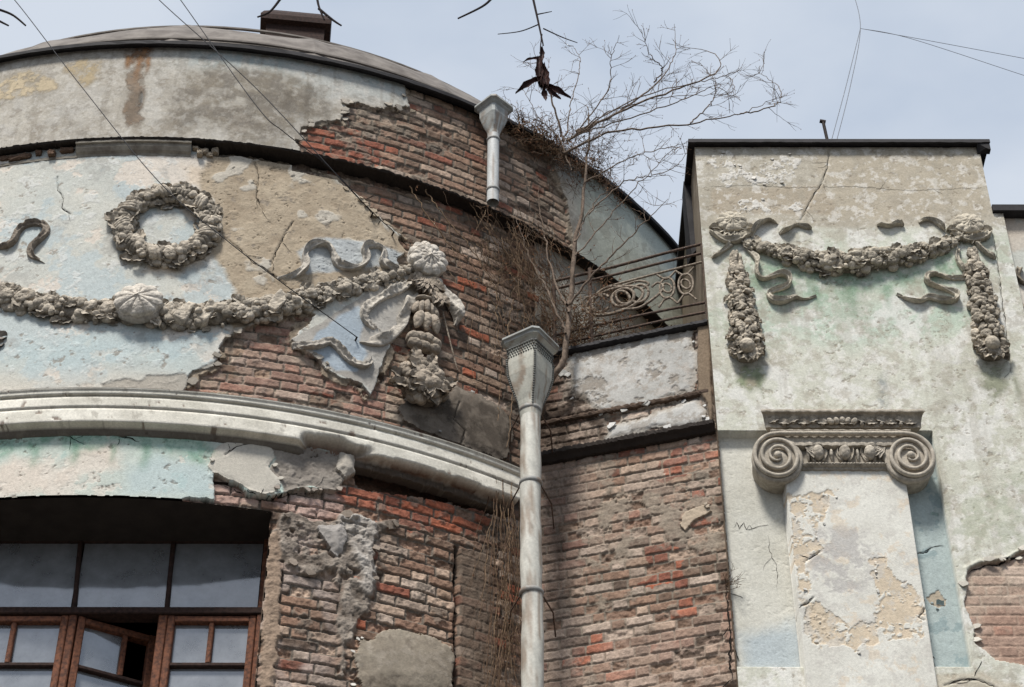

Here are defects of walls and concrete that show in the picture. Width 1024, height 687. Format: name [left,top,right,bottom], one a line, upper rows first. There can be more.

damp [123,64,145,126]
crack [226,169,292,282]
spalling [185,88,573,467]
flaking render [558,330,709,439]
spalling [256,452,522,687]
peeling [787,492,837,573]
peeling [803,557,947,654]
spalling [958,545,1024,665]